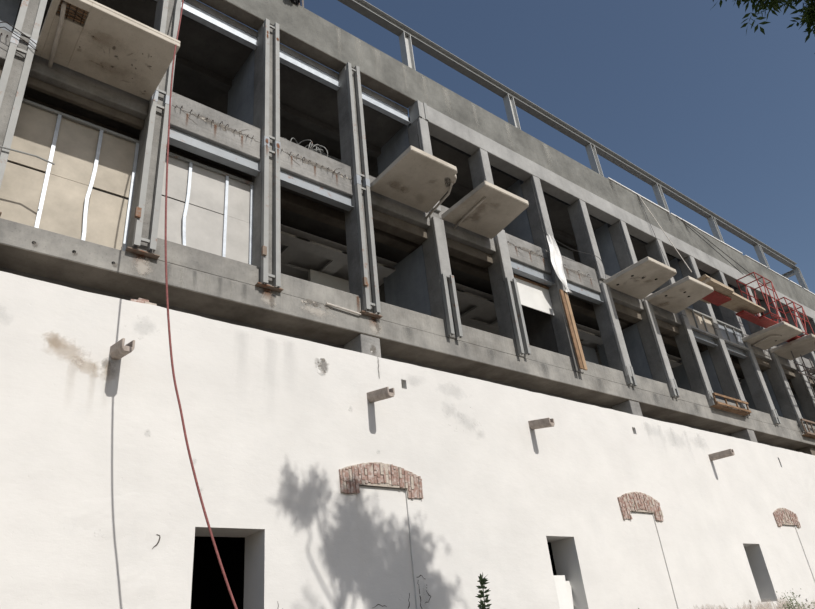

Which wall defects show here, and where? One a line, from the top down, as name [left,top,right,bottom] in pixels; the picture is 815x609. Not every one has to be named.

peeling [315,357,327,375]